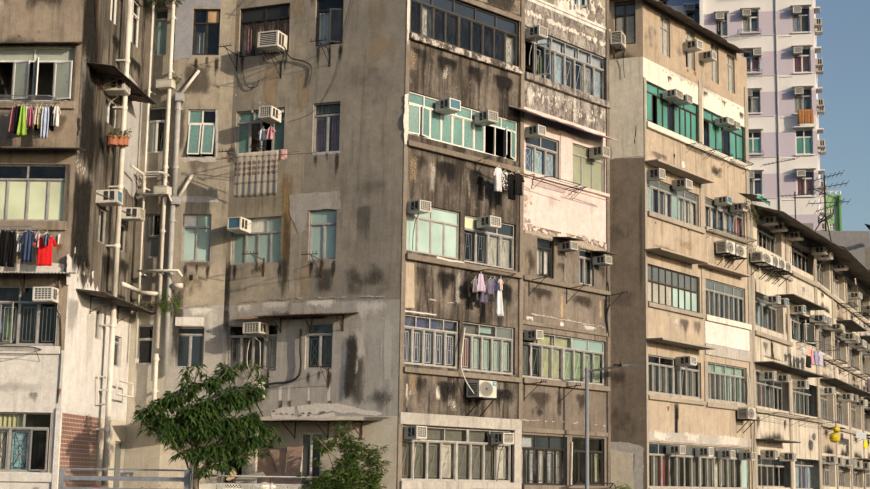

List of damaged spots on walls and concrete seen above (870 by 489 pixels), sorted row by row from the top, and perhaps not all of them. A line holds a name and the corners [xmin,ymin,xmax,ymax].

leakage [488,0,514,11]
peeling [525,0,606,49]
leakage [438,56,457,70]
leakage [494,75,512,91]
leakage [438,272,455,288]
leakage [495,284,512,304]
leakage [533,288,564,326]
leakage [575,296,606,323]
leakage [354,300,391,381]
leakage [343,335,364,402]
leakage [436,381,456,401]
leakage [496,389,512,404]